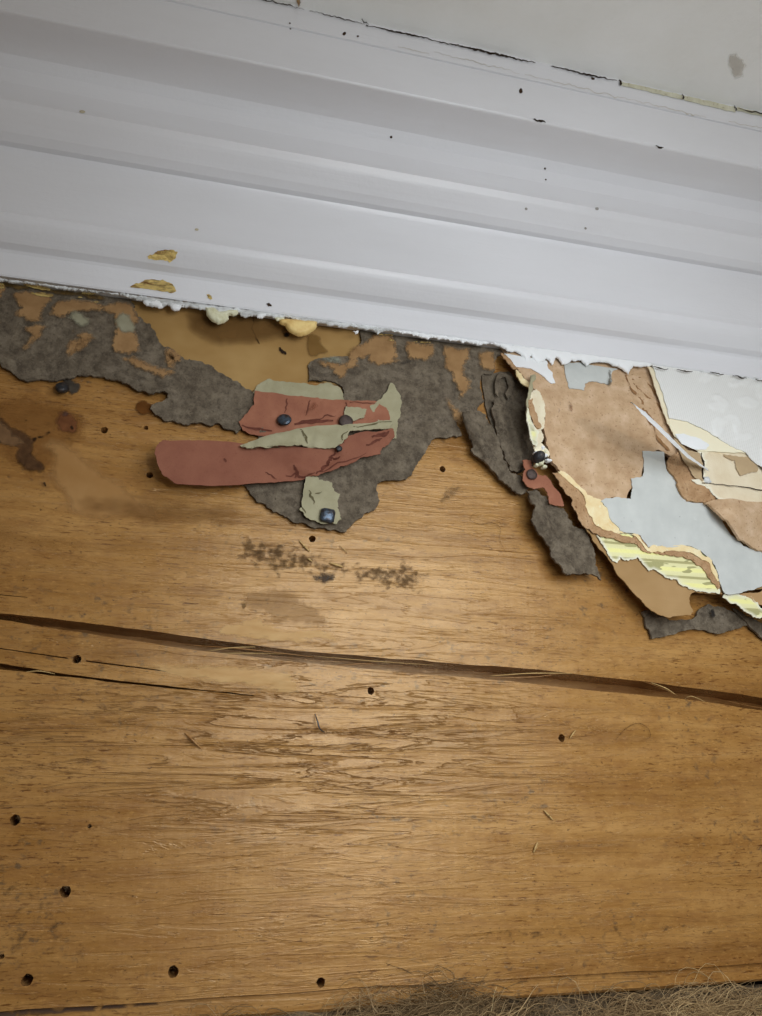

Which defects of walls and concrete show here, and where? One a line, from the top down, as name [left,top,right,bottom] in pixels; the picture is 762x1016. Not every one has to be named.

crack [265,0,699,116]
peeling [0,278,652,396]
crack [0,594,762,710]